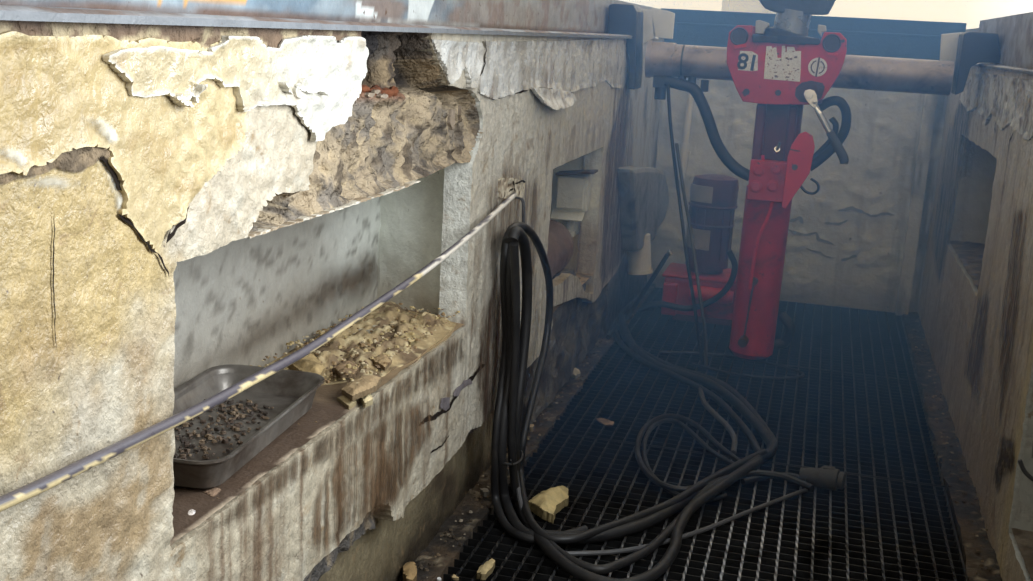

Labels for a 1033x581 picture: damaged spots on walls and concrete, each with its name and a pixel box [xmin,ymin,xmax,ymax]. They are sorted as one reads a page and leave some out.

peeling [0,20,628,252]
peeling [959,73,1033,141]
crack [100,156,189,275]
crack [50,223,58,347]
crack [421,364,484,453]